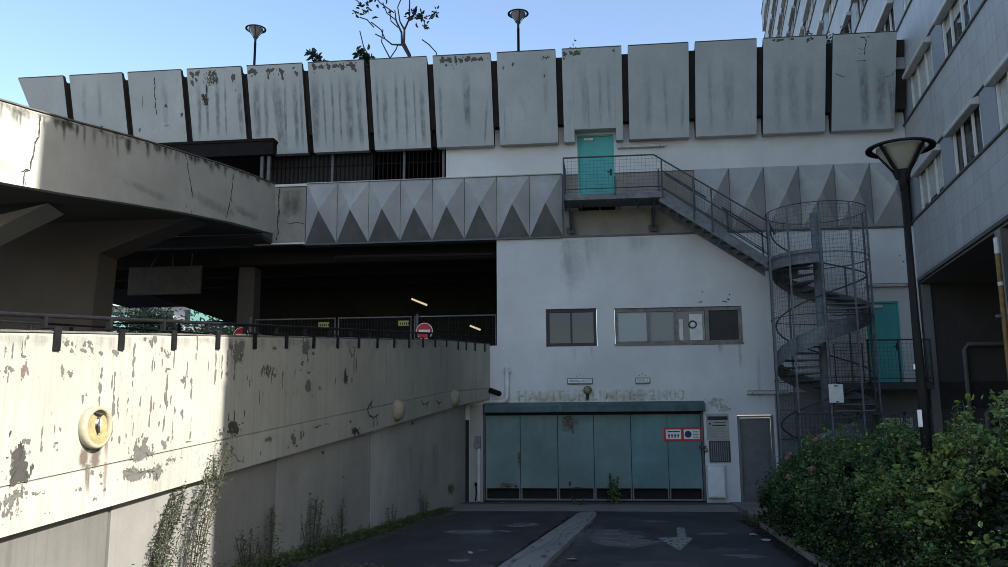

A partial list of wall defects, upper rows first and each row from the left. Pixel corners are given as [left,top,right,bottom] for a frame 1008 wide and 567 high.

peeling [189,70,218,105]
peeling [246,65,300,80]
peeling [312,59,357,73]
peeling [439,53,488,69]
crack [21,116,41,185]
peeling [0,333,30,382]
peeling [65,338,119,357]
peeling [181,334,198,399]
peeling [208,338,245,385]
spalling [82,336,184,482]
spalling [219,410,245,450]
spalling [0,425,62,525]